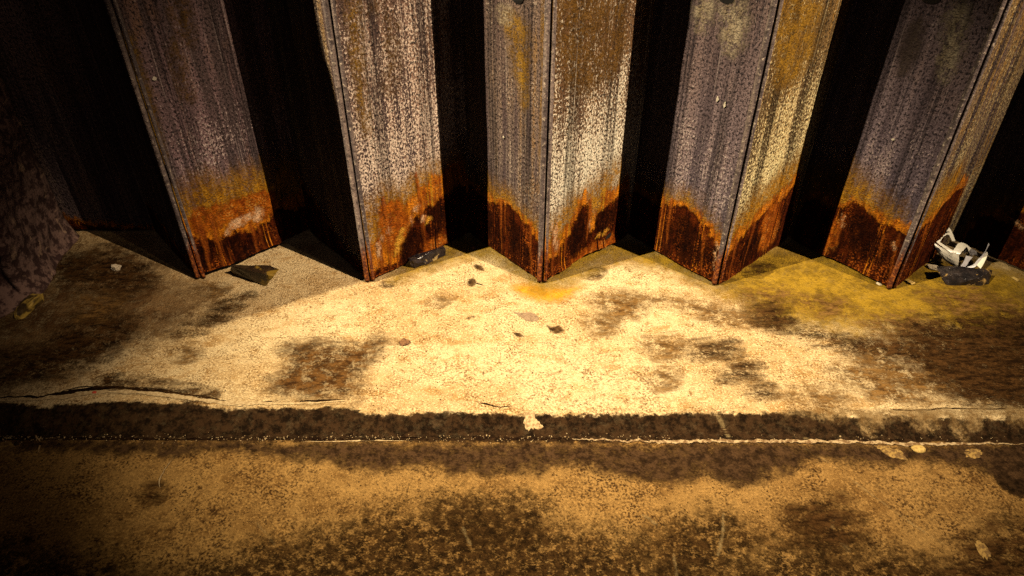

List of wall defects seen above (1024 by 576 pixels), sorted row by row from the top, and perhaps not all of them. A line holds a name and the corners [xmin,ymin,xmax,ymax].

corrosion [64,154,1024,287]
water stain [0,244,255,395]
water stain [94,373,220,403]
crack [0,385,345,405]
water stain [267,338,388,399]
water stain [383,236,1024,424]